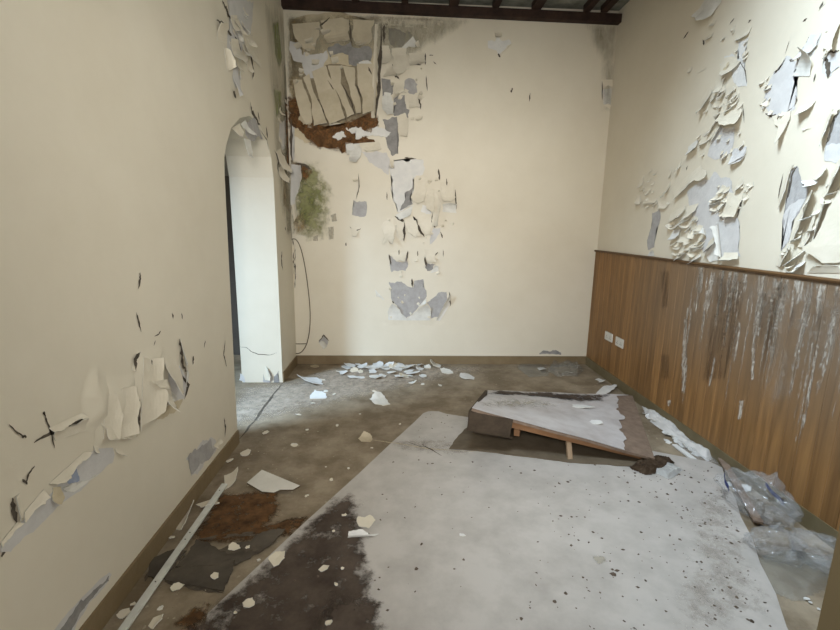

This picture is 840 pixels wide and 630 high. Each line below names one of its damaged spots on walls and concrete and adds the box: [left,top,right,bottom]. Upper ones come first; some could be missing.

peeling [217,0,261,98]
damp [273,24,337,241]
peeling [232,12,457,326]
peeling [635,19,753,264]
peeling [759,15,840,143]
peeling [776,109,840,273]
damp [681,267,840,442]
peeling [0,446,127,557]
flaking render [186,437,224,476]